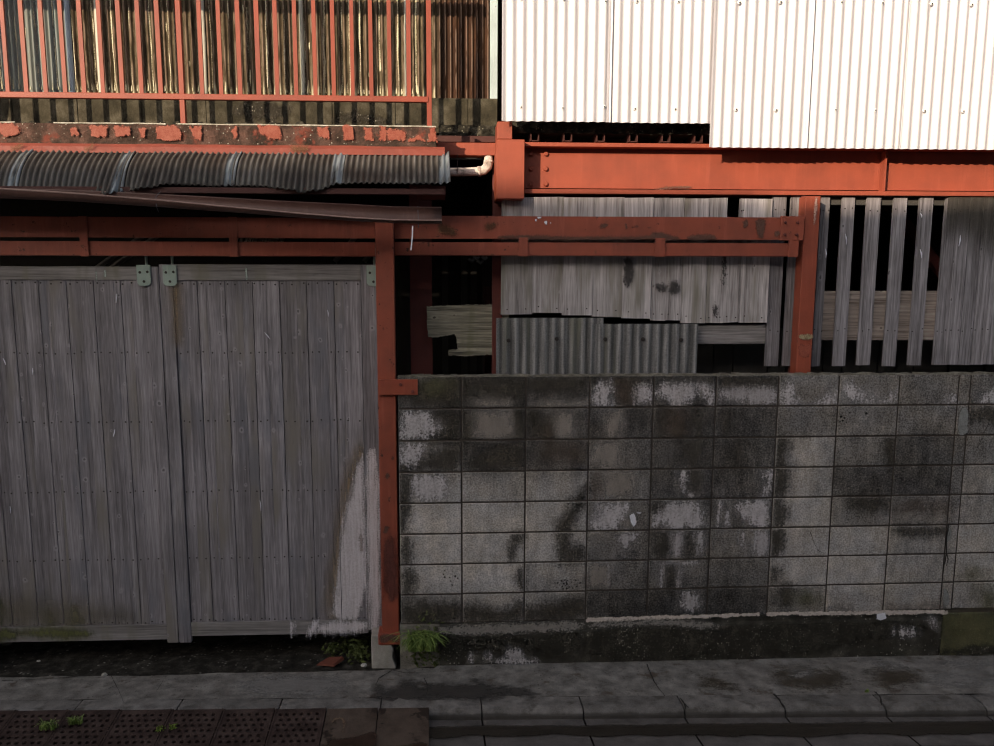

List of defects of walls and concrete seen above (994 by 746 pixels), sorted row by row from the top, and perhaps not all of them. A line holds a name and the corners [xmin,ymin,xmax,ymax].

peeling [0,122,20,138]
peeling [70,124,202,141]
peeling [257,124,282,140]
peeling [317,126,329,139]
peeling [342,124,437,143]
leakage [970,389,994,422]
leakage [399,376,937,665]
leakage [306,448,381,636]
leakage [372,678,538,701]